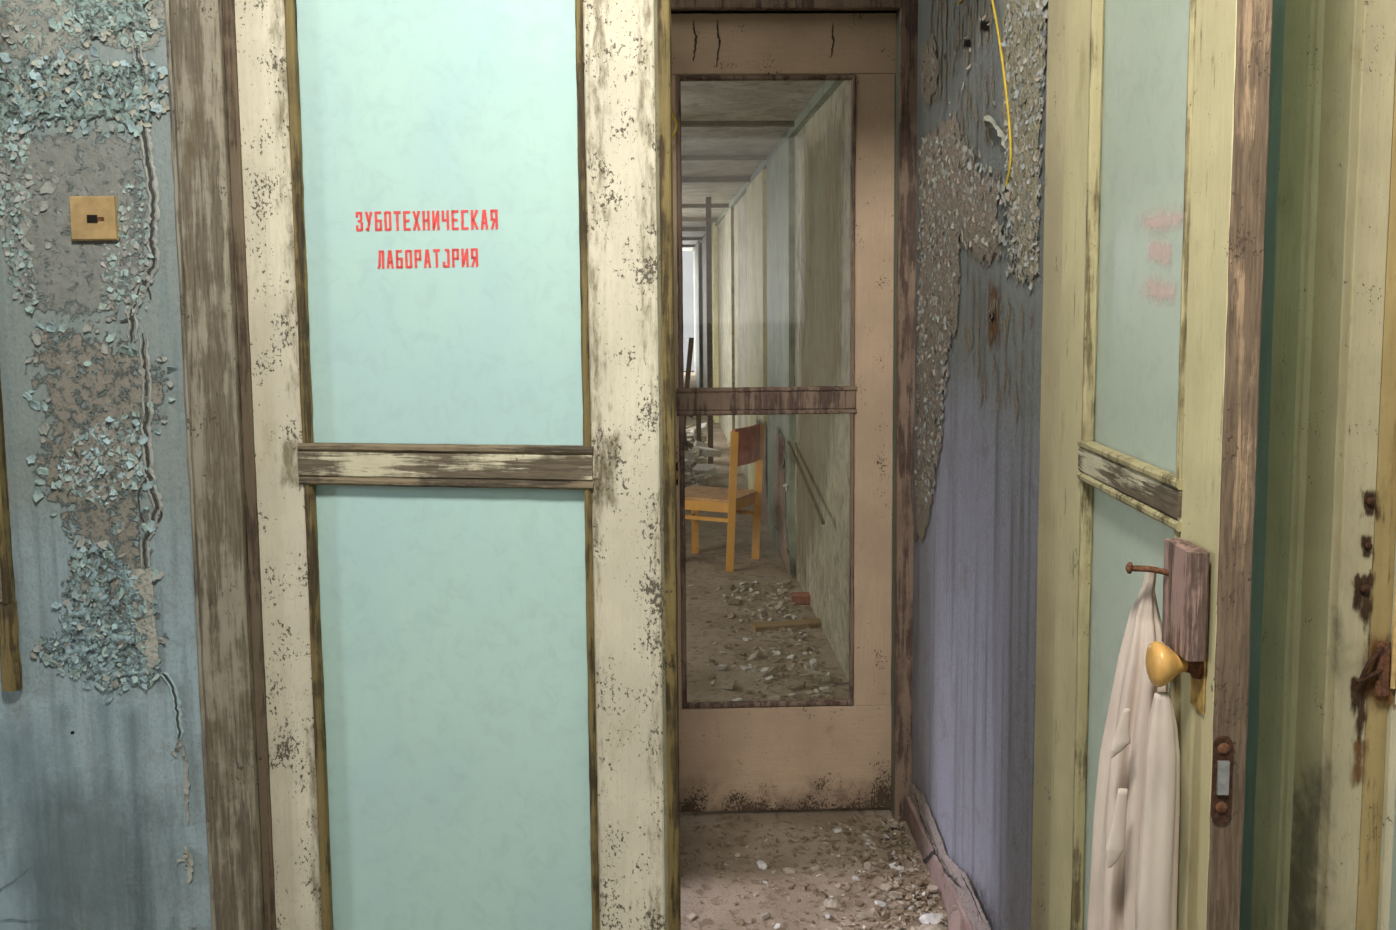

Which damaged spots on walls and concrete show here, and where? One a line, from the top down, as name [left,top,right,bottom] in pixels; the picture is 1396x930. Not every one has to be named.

peeling [0,0,166,70]
peeling [0,120,178,683]
crack [119,42,163,569]
flaking render [913,0,1048,541]
corrosion [1351,536,1396,785]
corrosion [1364,490,1384,519]